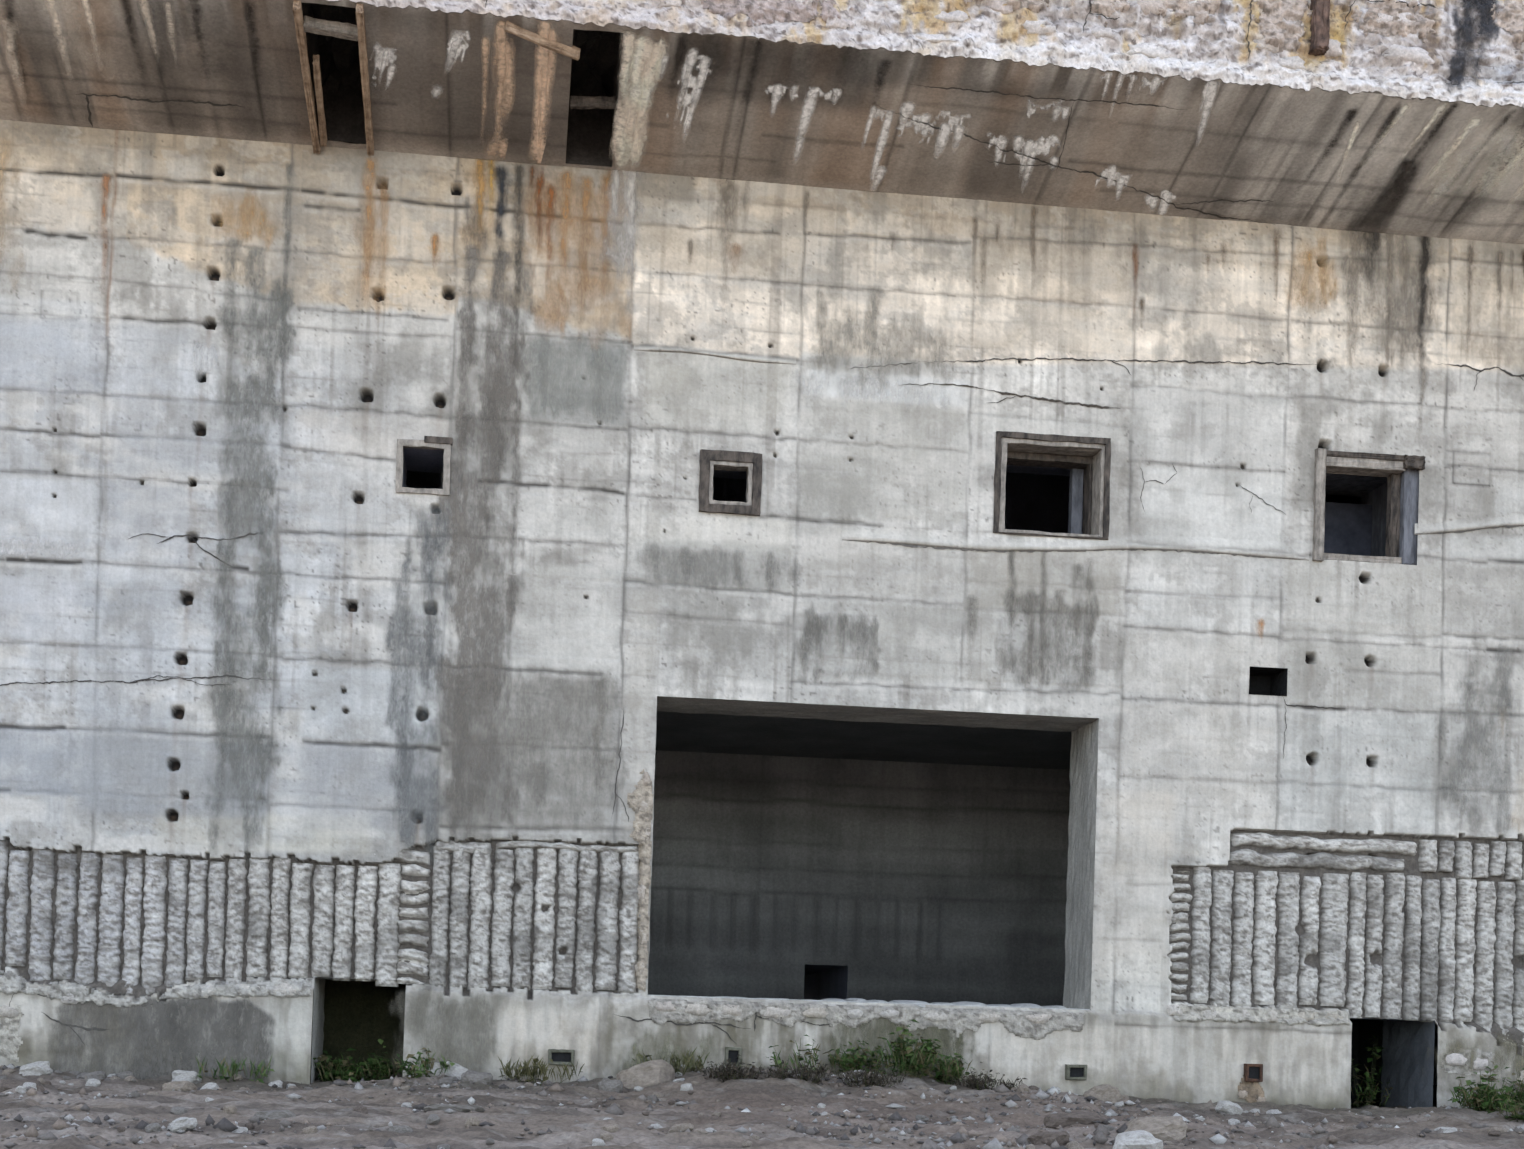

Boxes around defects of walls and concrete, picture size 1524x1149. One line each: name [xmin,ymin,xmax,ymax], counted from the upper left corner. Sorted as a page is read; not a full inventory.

spalling [292,0,374,156]
hole [504,21,624,167]
water stain [766,85,840,157]
water stain [865,103,969,188]
water stain [1391,0,1499,204]
corrosion [530,167,611,257]
crack [851,357,1318,409]
crack [1437,363,1524,389]
water stain [387,21,617,851]
crack [129,532,263,566]
crack [0,675,276,686]
spalling [0,769,1085,1062]